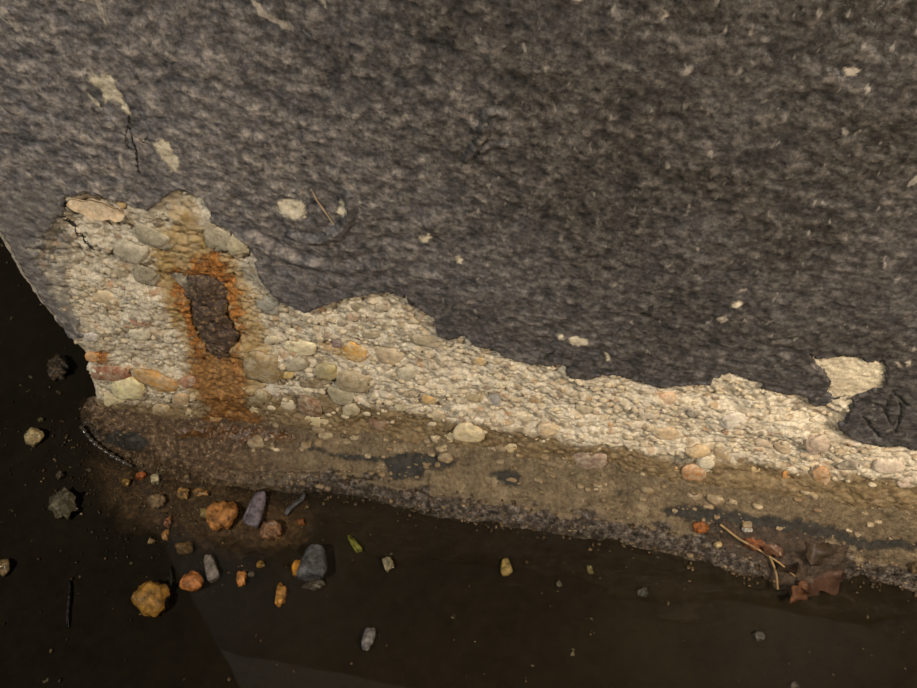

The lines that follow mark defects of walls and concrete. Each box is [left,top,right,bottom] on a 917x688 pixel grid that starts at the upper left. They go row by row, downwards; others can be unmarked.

peeling [251,0,291,30]
peeling [844,67,860,76]
peeling [88,71,131,114]
peeling [153,139,179,172]
rust [153,211,297,443]
spalling [0,190,917,488]
damp [101,430,149,451]
damp [300,443,456,481]
damp [490,470,521,486]
damp [663,505,917,550]